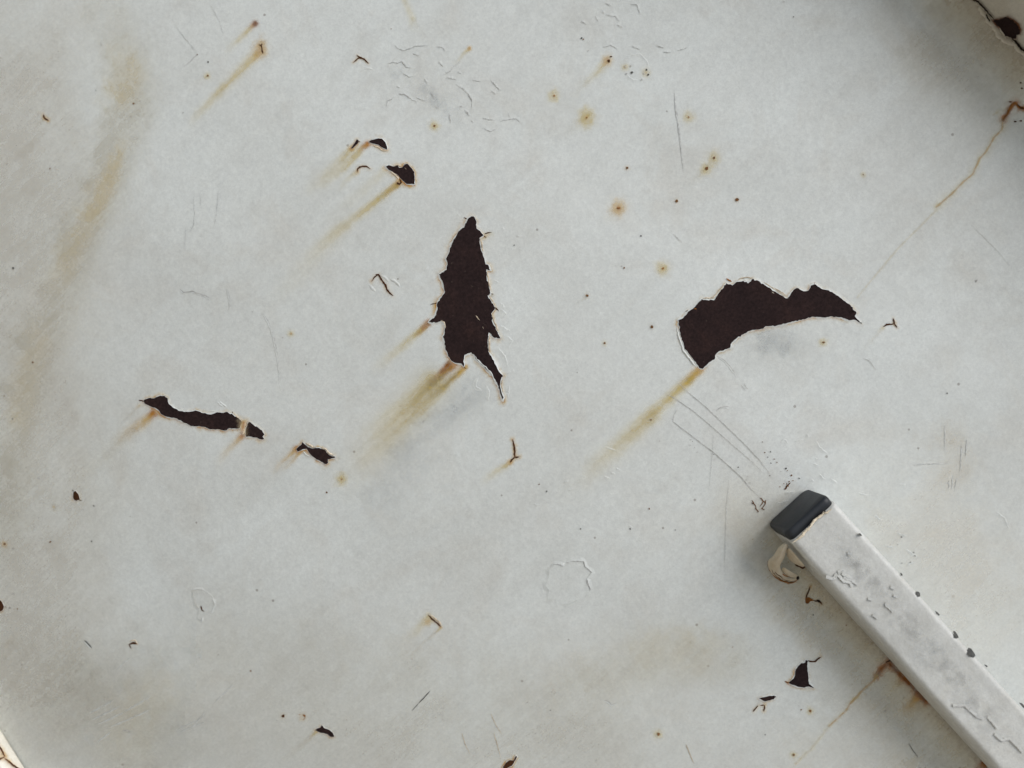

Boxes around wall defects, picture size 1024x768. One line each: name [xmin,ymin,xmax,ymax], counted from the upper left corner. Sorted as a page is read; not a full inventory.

peeling [349,137,389,151]
rust [362,180,402,213]
peeling [384,162,417,188]
peeling [427,213,507,404]
peeling [675,276,862,371]
rust [411,362,468,405]
rust [647,367,703,421]
peeling [139,393,266,442]
peeling [294,441,337,466]
peeling [785,657,821,690]